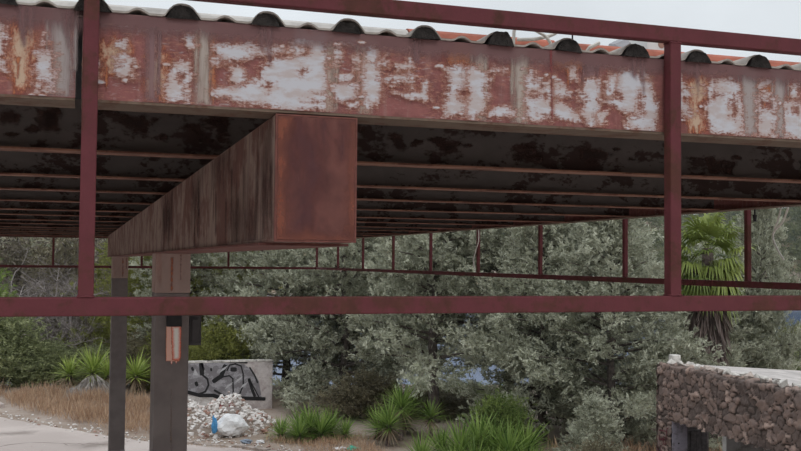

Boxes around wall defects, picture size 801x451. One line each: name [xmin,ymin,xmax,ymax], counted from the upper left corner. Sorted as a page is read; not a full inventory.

peeling [0,20,12,76]
rust [3,20,39,94]
rust [0,107,62,137]
peeling [26,31,61,96]
rust [98,35,135,88]
peeling [98,35,141,84]
rust [142,44,172,103]
rust [208,36,217,104]
peeling [161,33,662,131]
rust [684,73,709,134]
peeling [681,72,801,140]
rust [262,116,365,240]